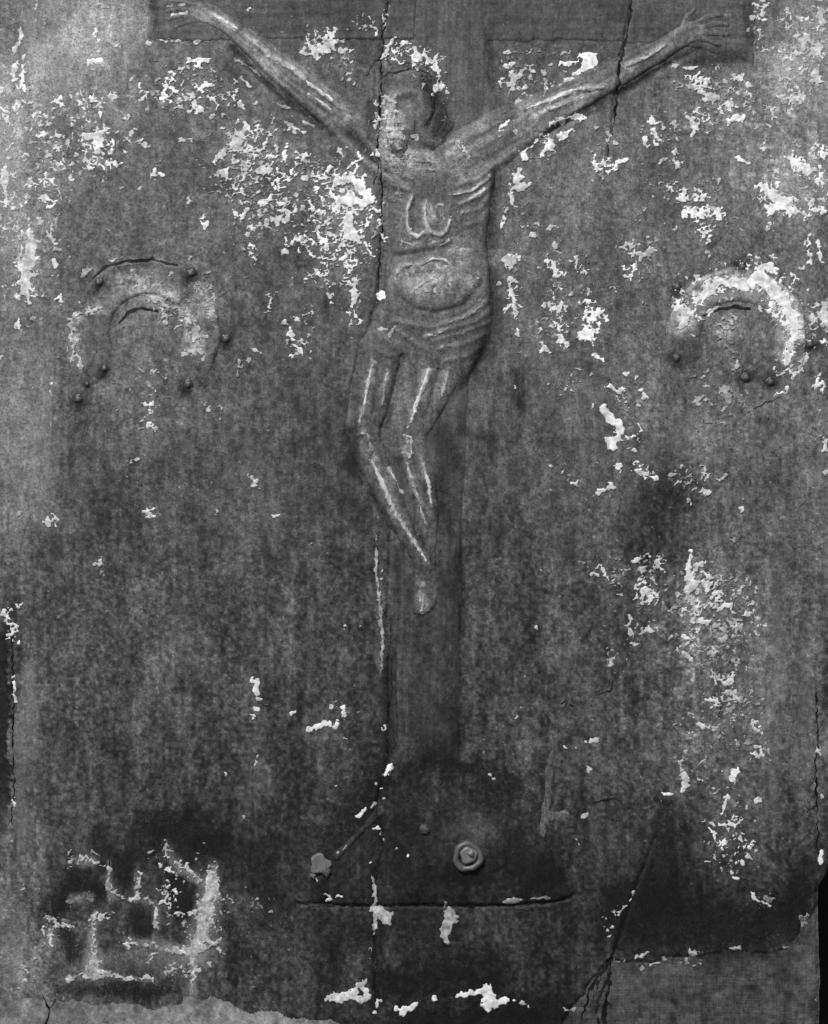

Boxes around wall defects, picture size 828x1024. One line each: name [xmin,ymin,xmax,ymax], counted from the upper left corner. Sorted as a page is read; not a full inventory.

peeling [0,26,489,377]
peeling [291,6,462,126]
crack [367,0,391,291]
crack [607,0,663,162]
peeling [494,0,828,432]
peeling [355,763,394,819]
peeling [580,549,772,880]
spalling [0,839,339,1024]
peeling [324,978,383,1014]
peeling [394,995,437,1017]
peeling [455,983,529,1013]
crack [580,837,655,1024]